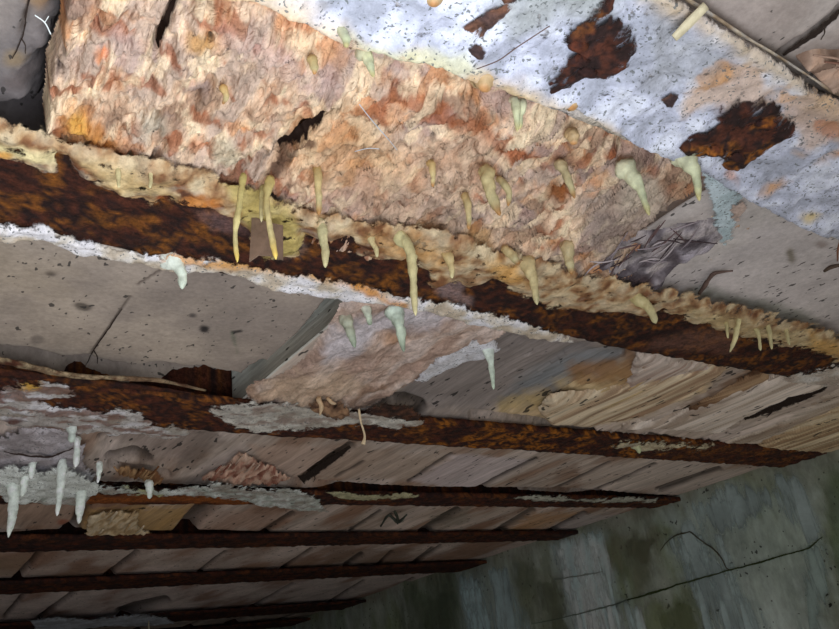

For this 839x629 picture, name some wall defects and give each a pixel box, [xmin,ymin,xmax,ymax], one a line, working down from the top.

corrosion [548,0,637,94]
crack [782,10,839,56]
spalling [42,0,723,291]
damp [244,0,839,245]
corrosion [661,94,678,108]
corrosion [679,96,795,171]
damp [0,117,839,390]
corrosion [0,357,206,394]
spalling [538,352,839,453]
damp [0,380,424,538]
damp [515,495,658,503]
crack [531,531,822,624]